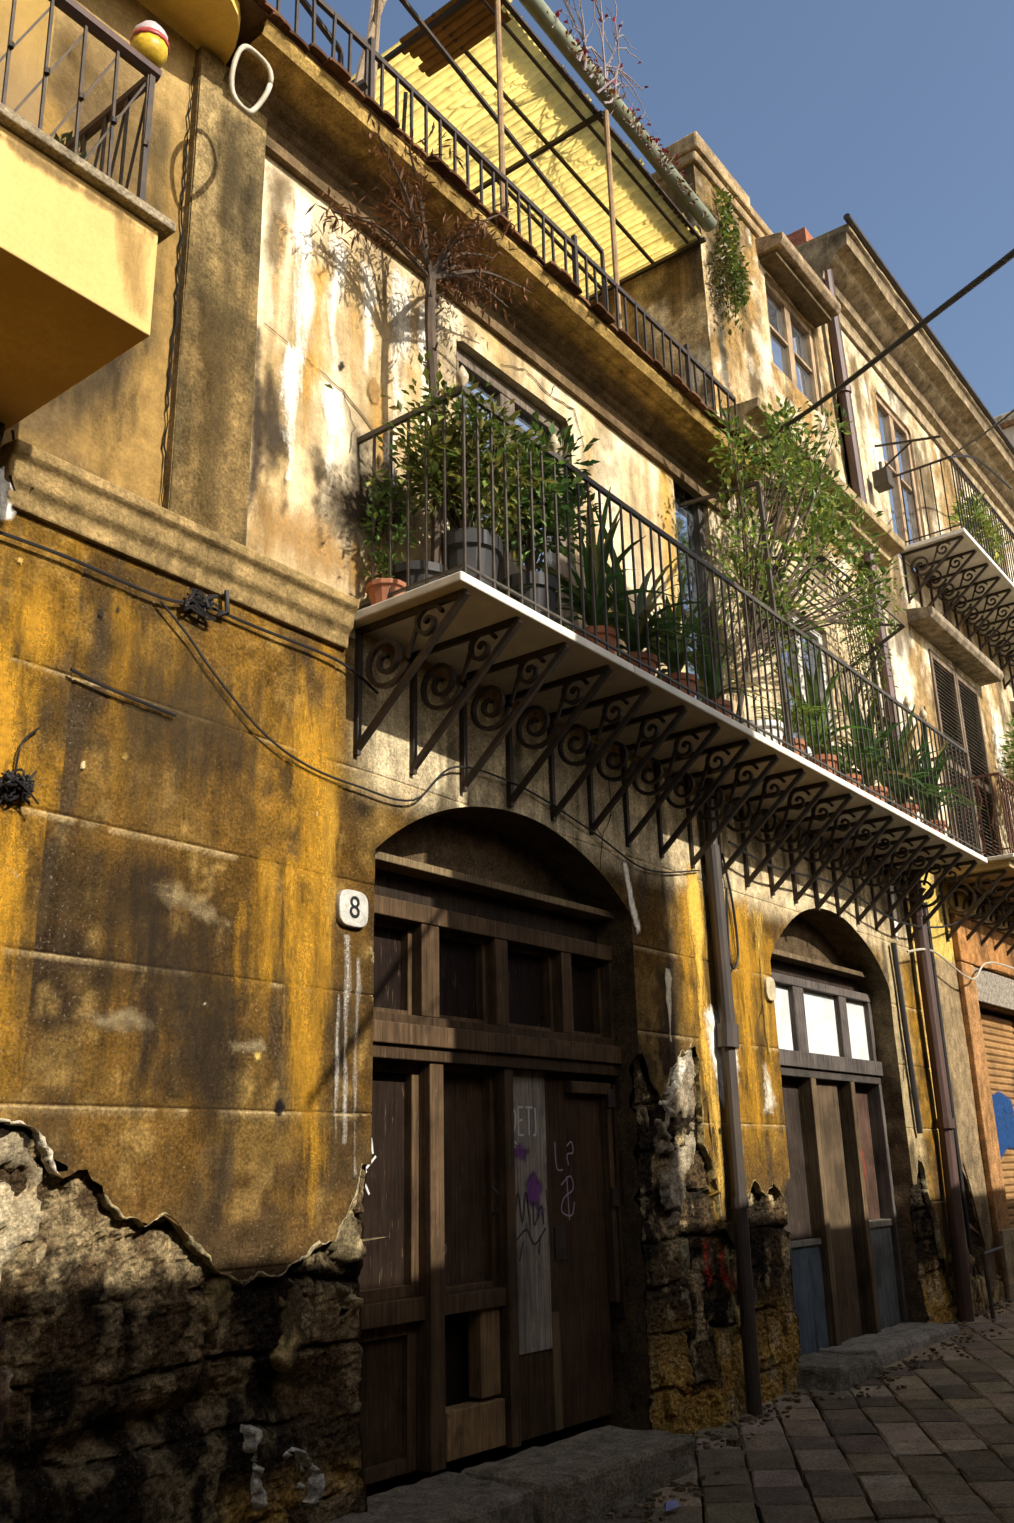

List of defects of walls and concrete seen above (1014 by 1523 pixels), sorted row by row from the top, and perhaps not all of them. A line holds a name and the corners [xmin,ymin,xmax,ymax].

leakage [217,105,244,215]
leakage [248,172,439,582]
leakage [22,601,49,655]
leakage [0,631,30,934]
leakage [263,705,334,1094]
spalling [0,1118,384,1523]
spalling [632,1042,801,1437]
spalling [909,1153,957,1324]
spalling [959,1163,986,1276]